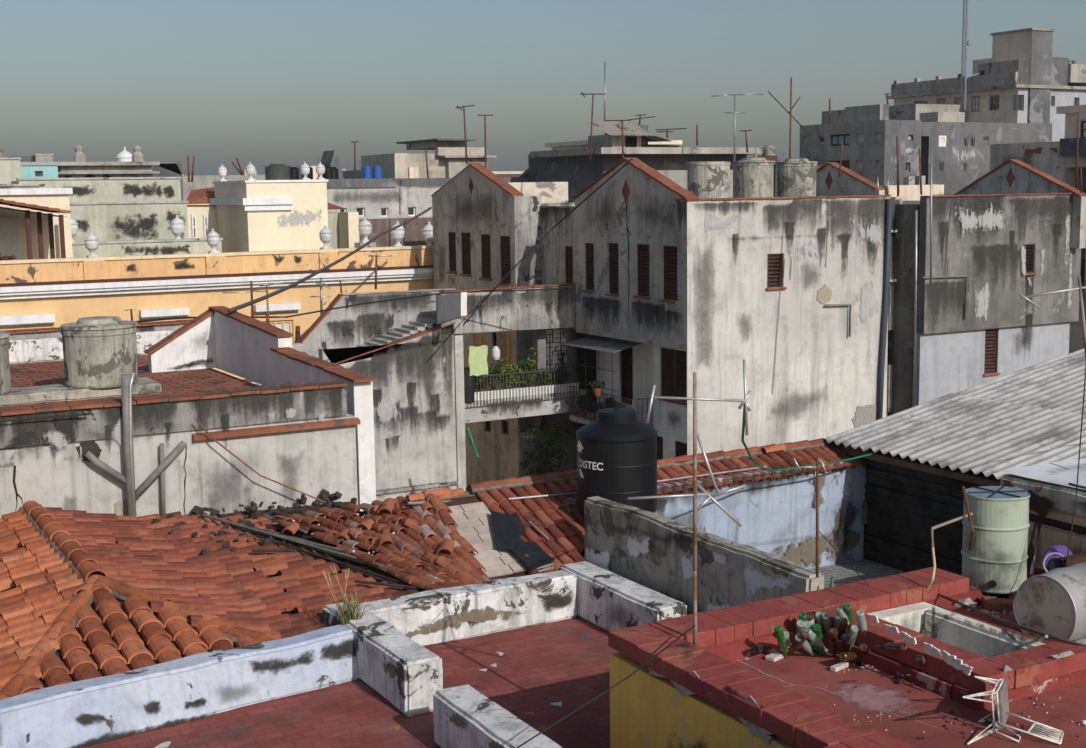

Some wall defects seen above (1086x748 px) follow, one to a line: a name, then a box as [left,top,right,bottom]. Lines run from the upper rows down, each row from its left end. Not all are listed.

leakage [647,200,686,222]
leakage [703,198,900,273]
peeling [955,203,1008,236]
leakage [698,255,710,359]
leakage [779,398,814,415]
leakage [0,409,84,467]
leakage [103,401,177,446]
spalling [1024,489,1054,518]
peeling [585,548,610,571]
peeling [627,536,650,559]
peeling [772,532,849,566]
peeling [743,566,791,596]